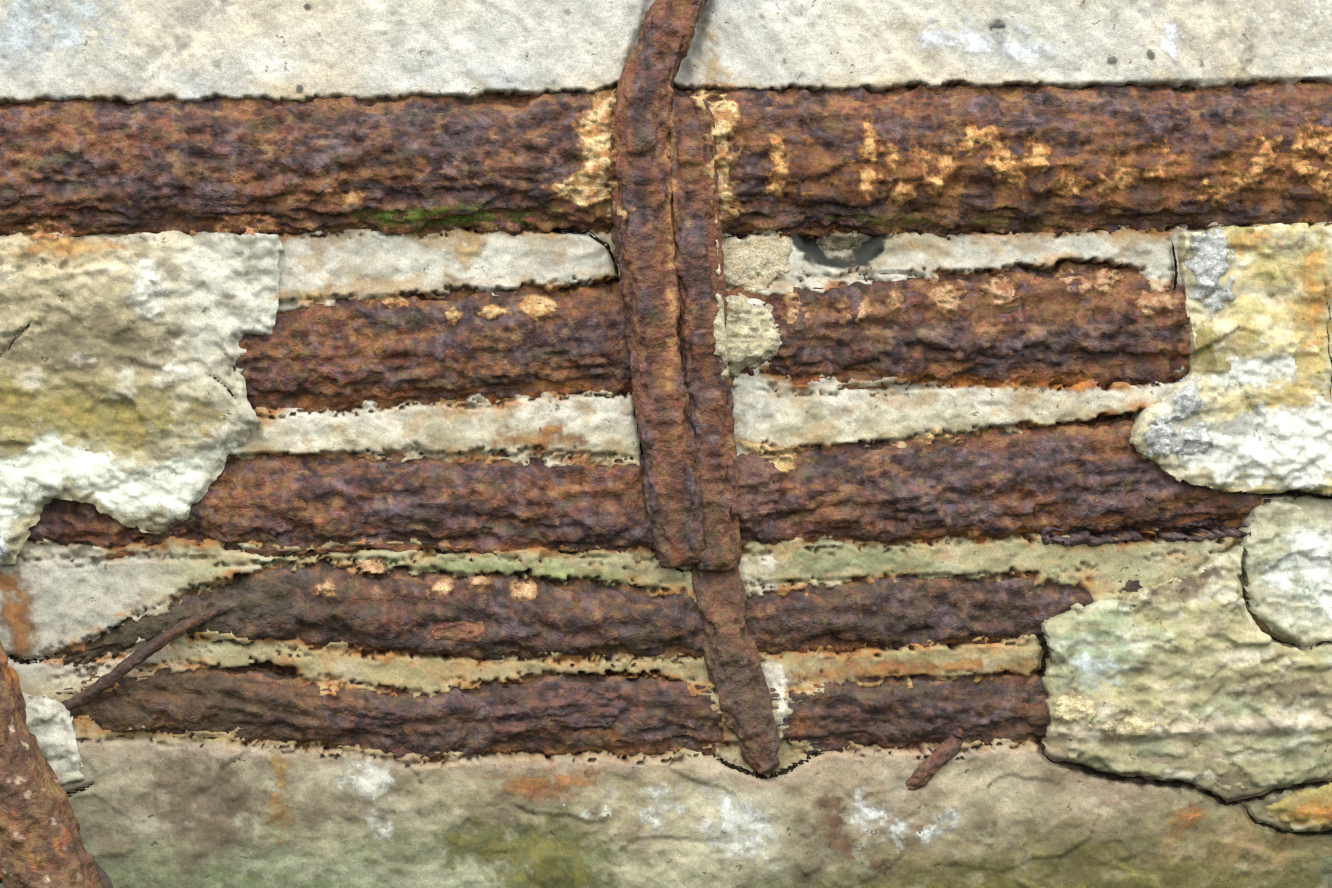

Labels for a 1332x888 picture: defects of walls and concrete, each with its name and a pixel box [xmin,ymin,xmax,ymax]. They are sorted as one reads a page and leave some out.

spalling [790,231,888,269]
peeling [1184,228,1235,320]
rust [896,376,1122,392]
peeling [1143,367,1214,459]
rust [1036,517,1251,547]
rust [0,571,36,658]
rust [431,620,487,643]
peeling [1050,690,1170,740]
rust [905,735,962,790]
efflorescence [640,788,684,829]
efflorescence [699,788,778,859]
efflorescence [850,789,959,850]